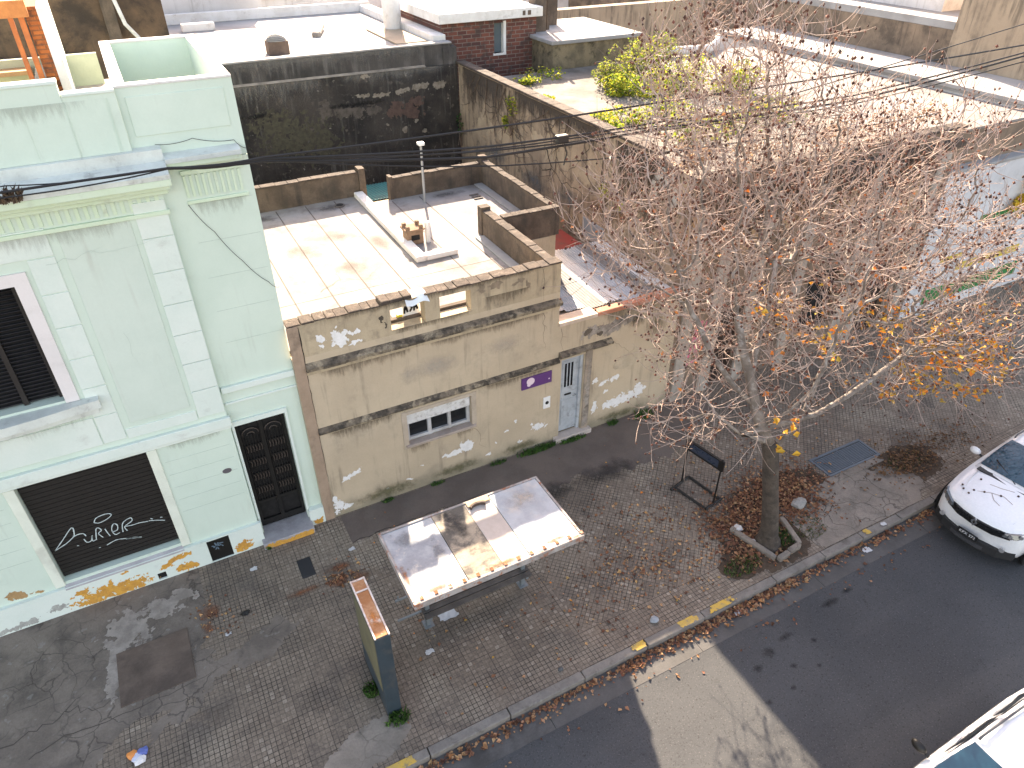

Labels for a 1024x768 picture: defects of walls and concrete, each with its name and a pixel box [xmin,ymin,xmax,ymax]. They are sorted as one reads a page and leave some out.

peeling [315,326,362,349]
peeling [581,360,646,427]
peeling [442,439,474,458]
peeling [235,496,354,552]
peeling [0,551,200,636]
crack [0,664,227,760]